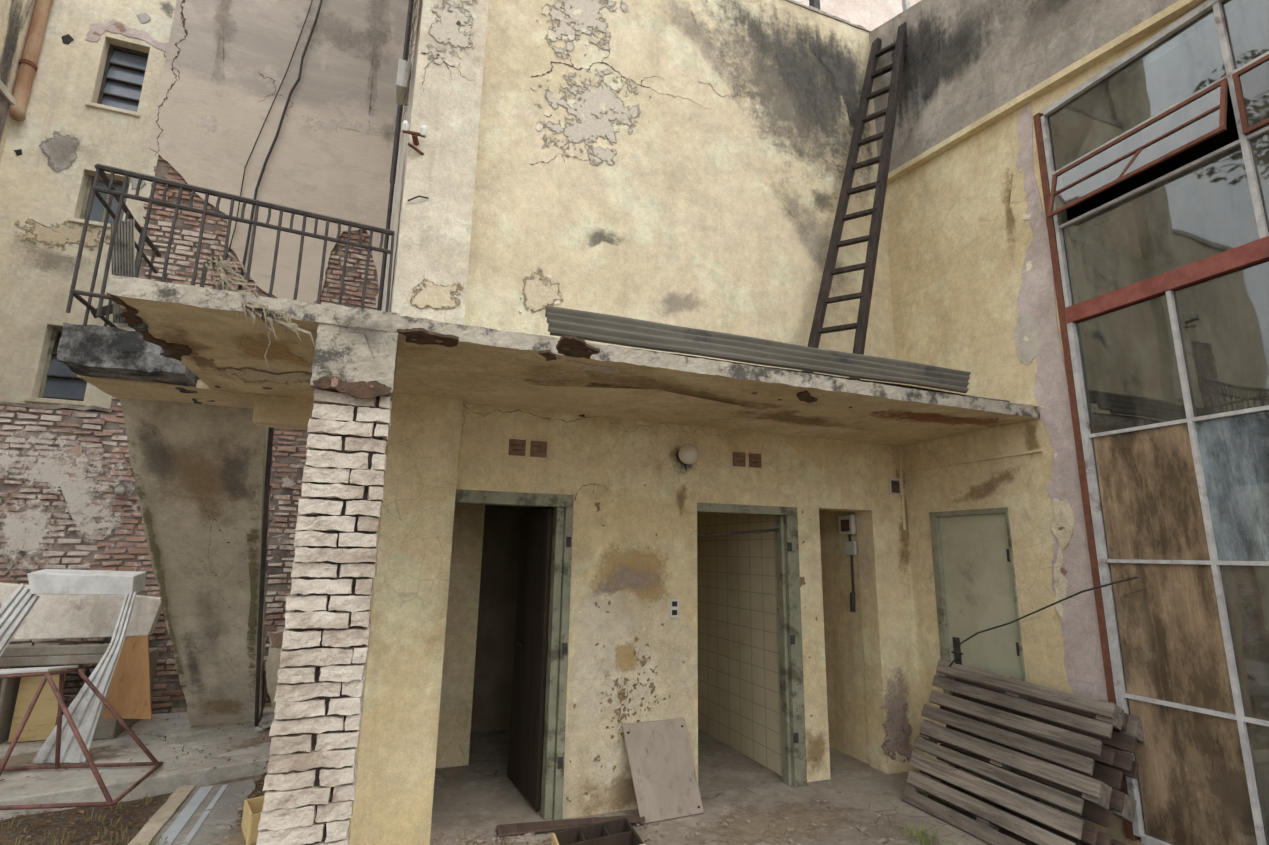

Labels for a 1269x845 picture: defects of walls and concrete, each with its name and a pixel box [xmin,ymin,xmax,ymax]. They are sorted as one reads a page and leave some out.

flaking render [85,18,168,53]
crack [155,0,188,156]
peeling [427,0,478,67]
peeling [530,0,651,166]
damp [678,3,864,173]
damp [893,12,992,118]
peeling [410,279,464,311]
peeling [518,267,564,314]
rust [870,410,1002,427]
damp [616,644,637,671]